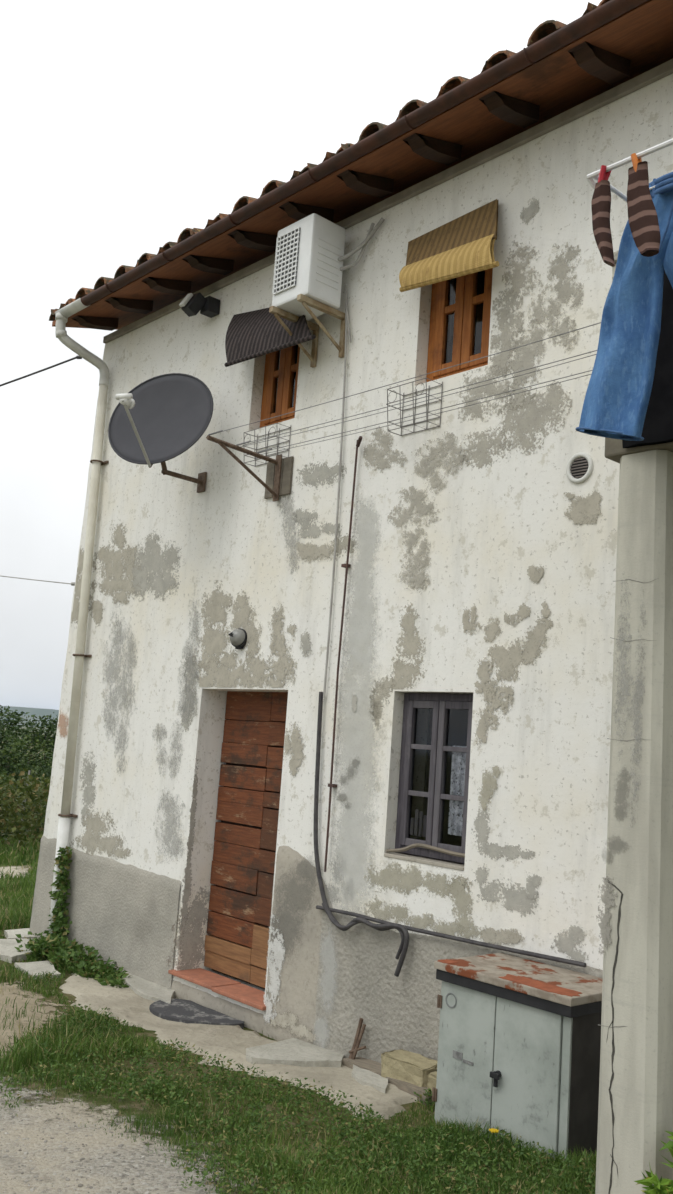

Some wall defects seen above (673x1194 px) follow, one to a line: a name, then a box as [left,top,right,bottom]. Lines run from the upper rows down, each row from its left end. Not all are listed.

peeling [520,196,539,225]
peeling [71,523,186,628]
peeling [296,461,347,488]
peeling [292,508,356,563]
peeling [351,240,584,745]
peeling [564,490,603,525]
peeling [181,581,312,732]
peeling [69,752,131,859]
peeling [364,766,542,945]
crack [600,877,628,1194]